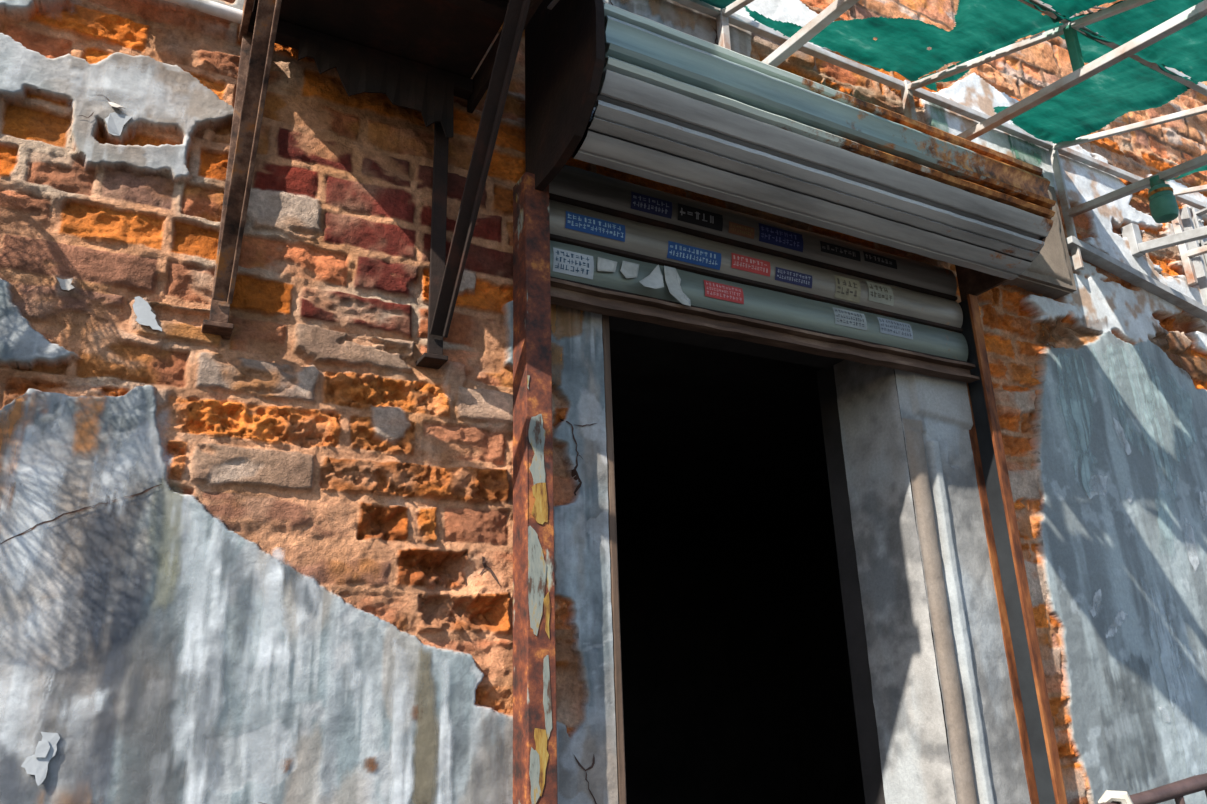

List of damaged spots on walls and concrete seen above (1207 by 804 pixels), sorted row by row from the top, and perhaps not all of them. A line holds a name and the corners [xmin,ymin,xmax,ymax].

leakage [9,468,61,585]
flaking render [21,732,60,786]
crack [1,482,168,544]
leakage [61,503,315,804]
flaking render [0,0,530,715]
leakage [392,649,451,804]
flaking render [528,388,589,804]
crack [559,418,597,495]
crack [574,755,597,804]
flaking render [750,32,1207,804]
leakage [1055,343,1196,546]
leakage [1111,589,1207,775]